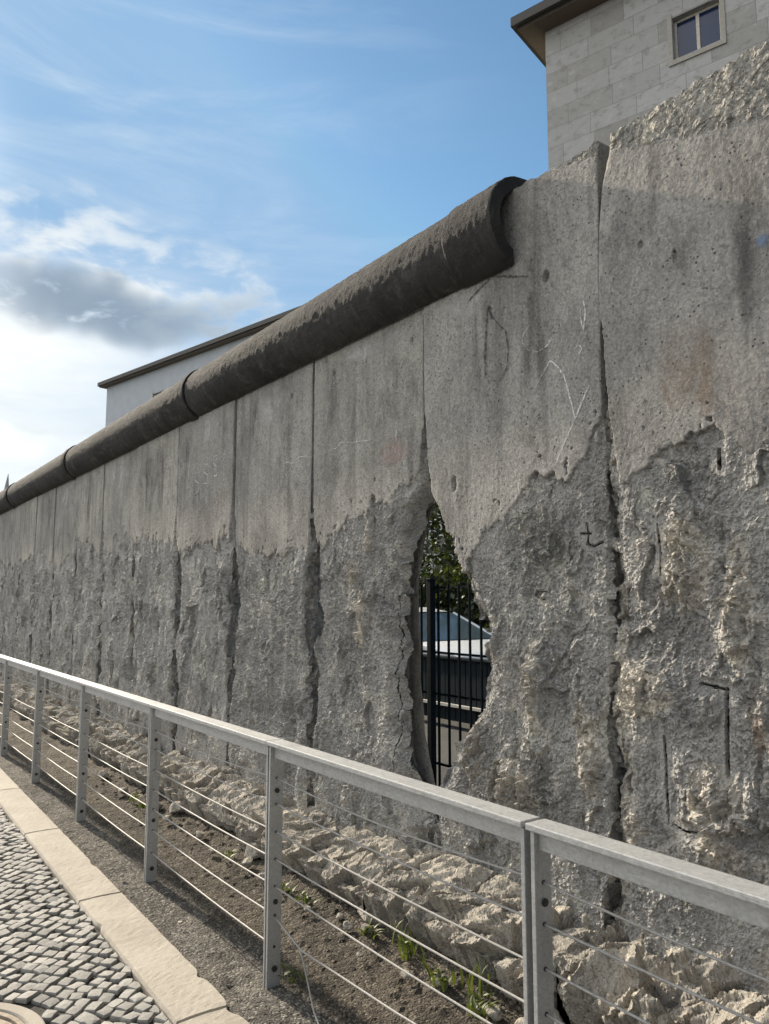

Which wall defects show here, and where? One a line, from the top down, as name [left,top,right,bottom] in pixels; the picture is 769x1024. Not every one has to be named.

spalling [0,429,434,797]
crack [392,595,405,772]
spalling [439,396,769,886]
spalling [283,761,521,884]
spalling [550,854,769,995]